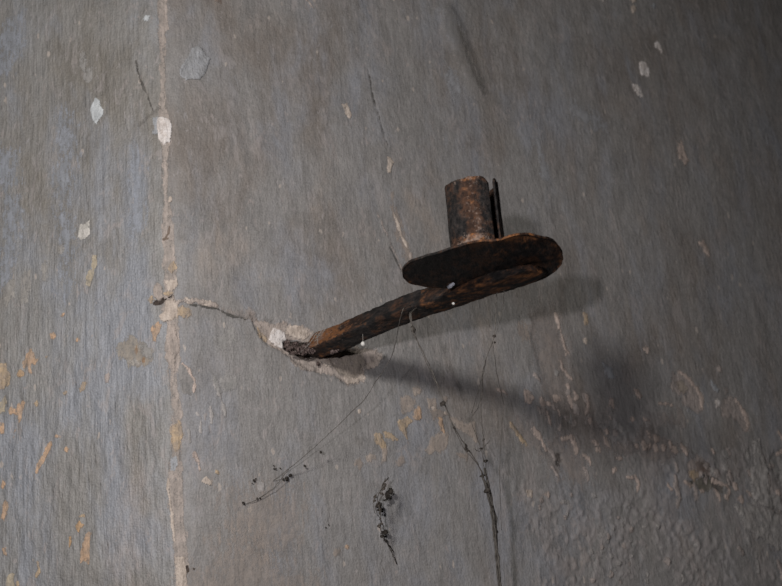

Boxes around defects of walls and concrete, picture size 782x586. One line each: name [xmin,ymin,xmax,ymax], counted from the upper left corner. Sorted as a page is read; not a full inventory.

spalling [90,98,103,124]
spalling [143,0,227,586]
peeling [0,349,47,434]
spalling [250,315,382,386]
peeling [354,387,478,469]
peeling [510,389,635,487]
peeling [667,380,782,551]
peeling [69,514,91,564]